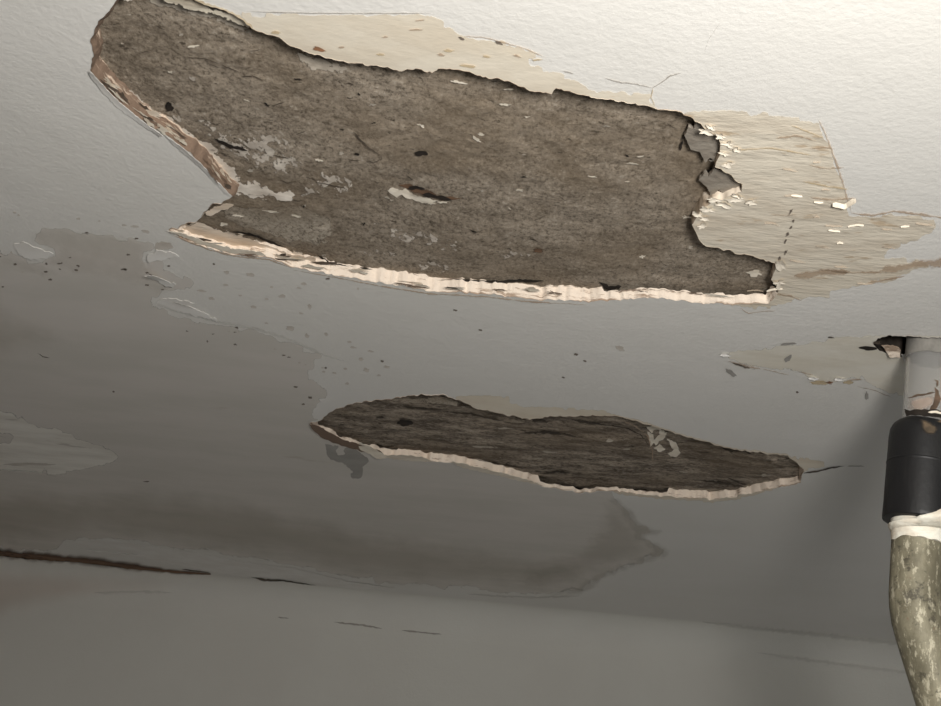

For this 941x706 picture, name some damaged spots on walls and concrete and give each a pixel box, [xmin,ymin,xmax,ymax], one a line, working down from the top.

spalling [89,0,941,314]
peeling [719,335,941,400]
peeling [0,224,848,594]
damp [325,444,369,479]
crack [0,550,211,575]